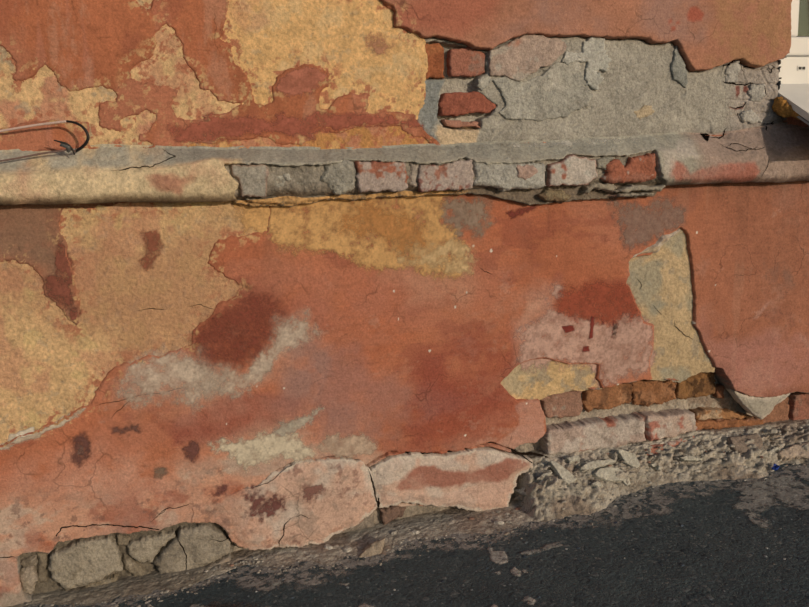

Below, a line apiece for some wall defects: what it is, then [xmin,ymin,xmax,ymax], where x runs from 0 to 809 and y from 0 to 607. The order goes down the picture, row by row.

crack [111,151,176,171]
crack [710,60,775,176]
peeling [0,0,785,444]
water stain [118,317,317,406]
flaking render [500,228,809,470]
crack [55,503,192,569]
flaking render [19,522,234,594]